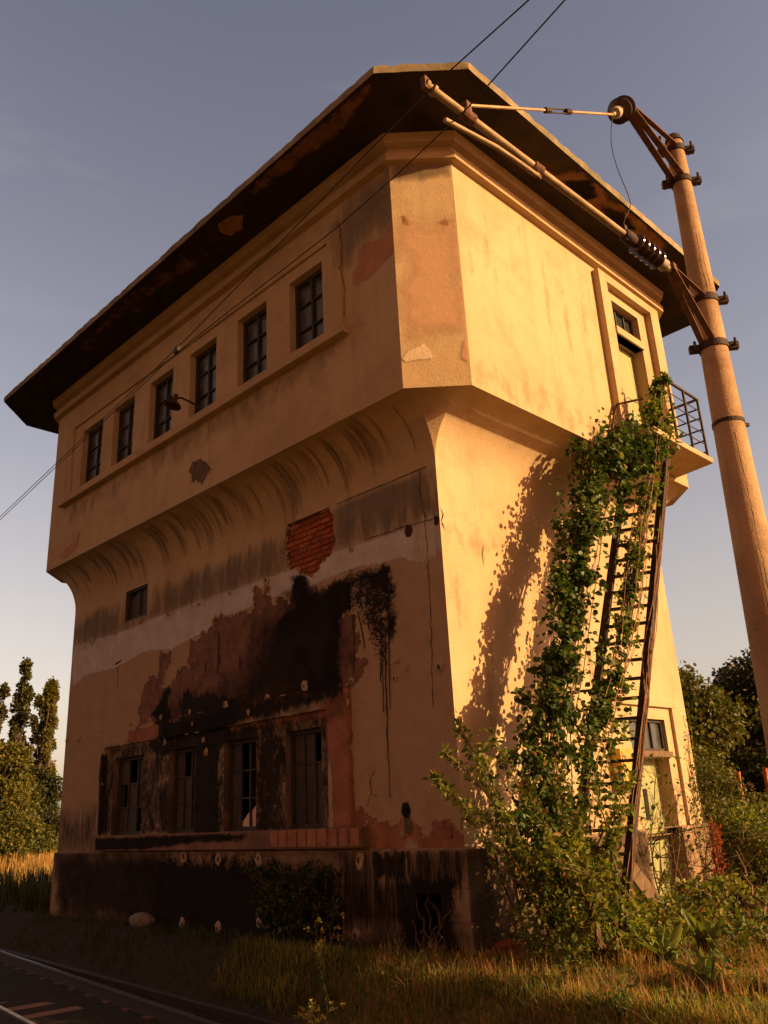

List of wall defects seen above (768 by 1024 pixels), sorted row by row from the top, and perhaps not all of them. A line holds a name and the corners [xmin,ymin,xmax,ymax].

peeling [218,215,243,236]
peeling [352,223,394,286]
spalling [189,457,212,486]
flaking render [283,507,336,576]
flaking render [128,584,296,743]
damp [352,607,391,798]
flaking render [302,612,464,848]
damp [339,850,466,950]